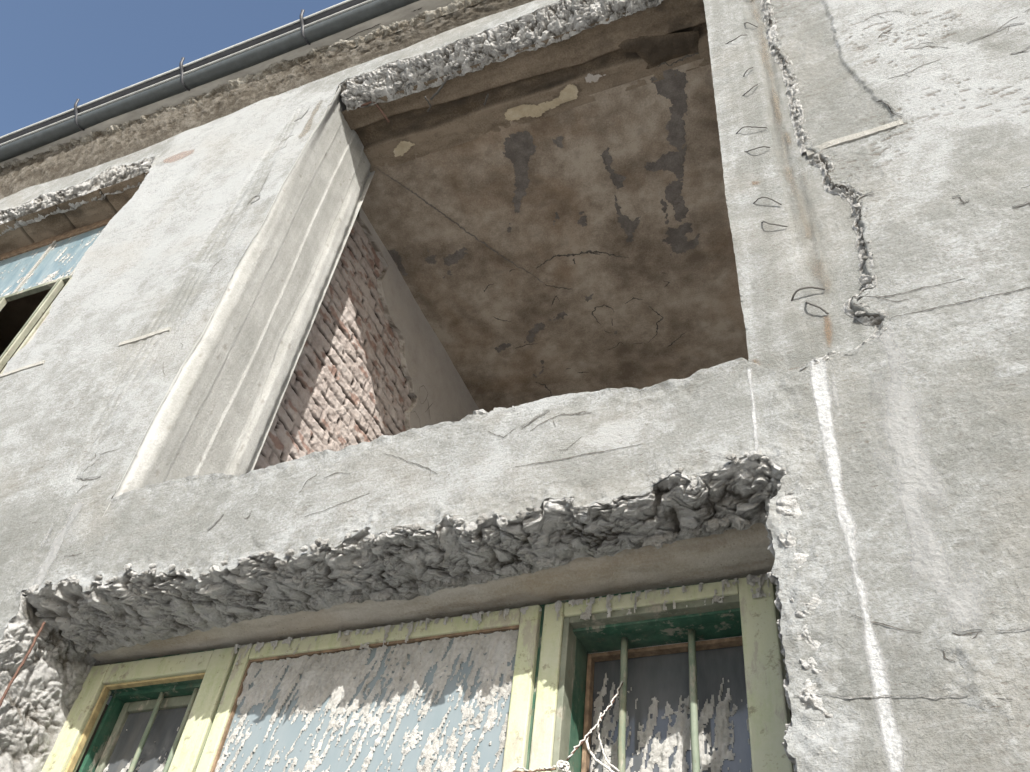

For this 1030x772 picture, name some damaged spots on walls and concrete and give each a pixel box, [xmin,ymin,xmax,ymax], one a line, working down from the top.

spalling [0,0,663,242]
spalling [253,217,418,470]
crack [592,272,686,350]
spalling [0,449,814,772]
spalling [767,570,838,772]
damp [811,358,902,772]